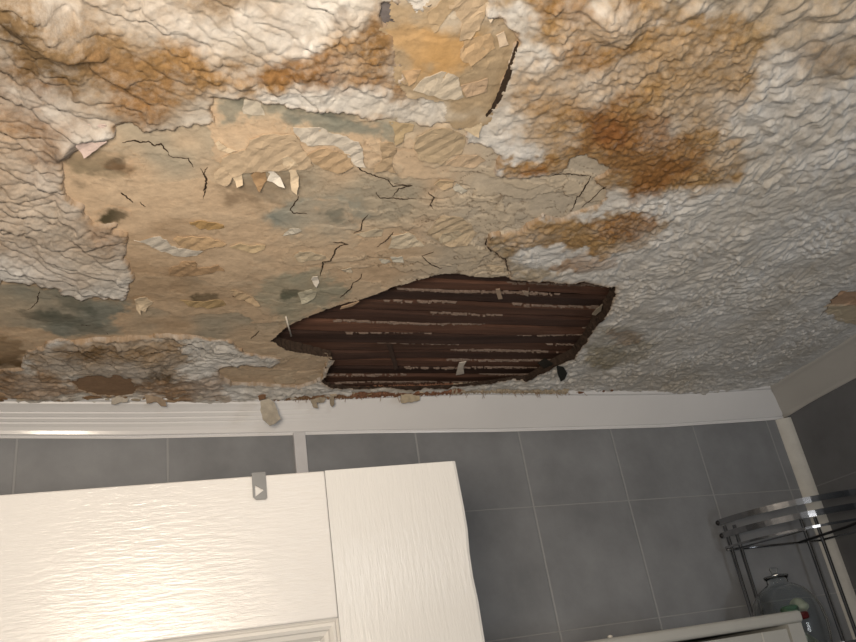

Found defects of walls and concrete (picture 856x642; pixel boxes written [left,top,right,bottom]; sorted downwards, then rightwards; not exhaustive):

crack [122,140,207,199]
peeling [63,0,608,385]
crack [320,167,435,276]
water stain [0,0,856,404]
crack [552,173,607,211]
crack [485,237,509,274]
peeling [824,290,856,325]